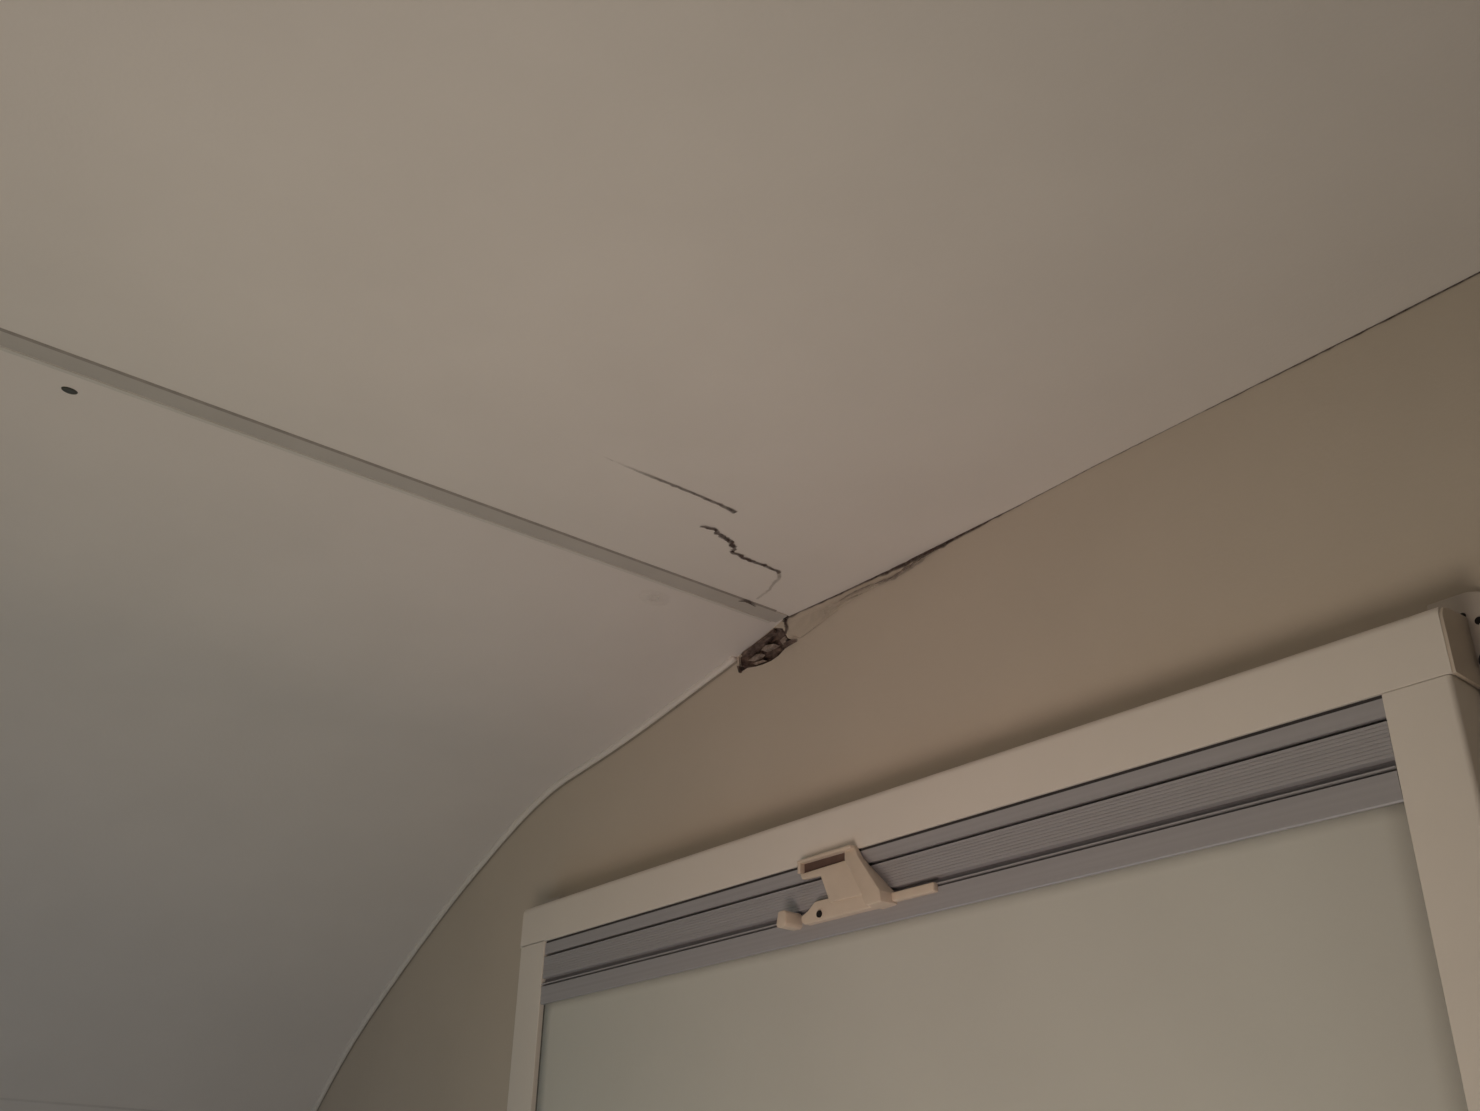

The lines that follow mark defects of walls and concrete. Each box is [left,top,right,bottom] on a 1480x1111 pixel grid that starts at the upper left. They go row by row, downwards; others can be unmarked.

crack [1207,272,1480,410]
crack [656,478,781,574]
crack [782,495,1038,634]